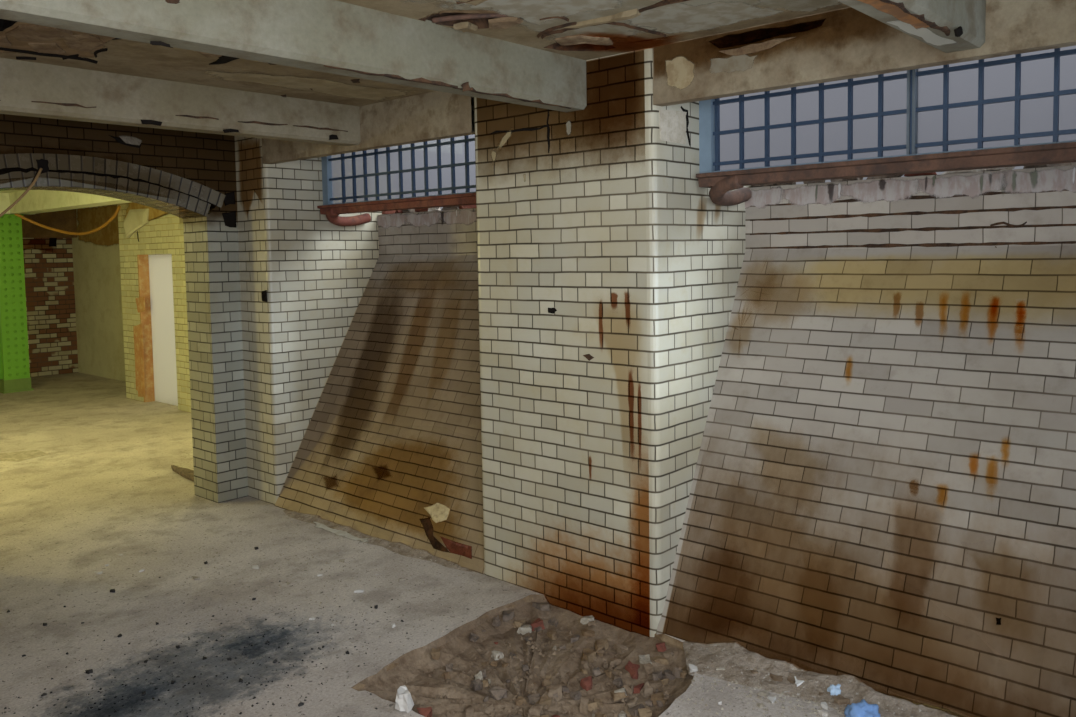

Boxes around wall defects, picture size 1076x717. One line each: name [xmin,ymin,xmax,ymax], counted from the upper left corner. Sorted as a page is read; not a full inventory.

spalling [0,19,120,64]
peeling [418,0,884,90]
corrosion [858,0,963,46]
peeling [196,51,409,101]
spalling [752,162,1076,187]
corrosion [599,293,630,346]
corrosion [628,374,641,451]
spalling [419,503,472,559]